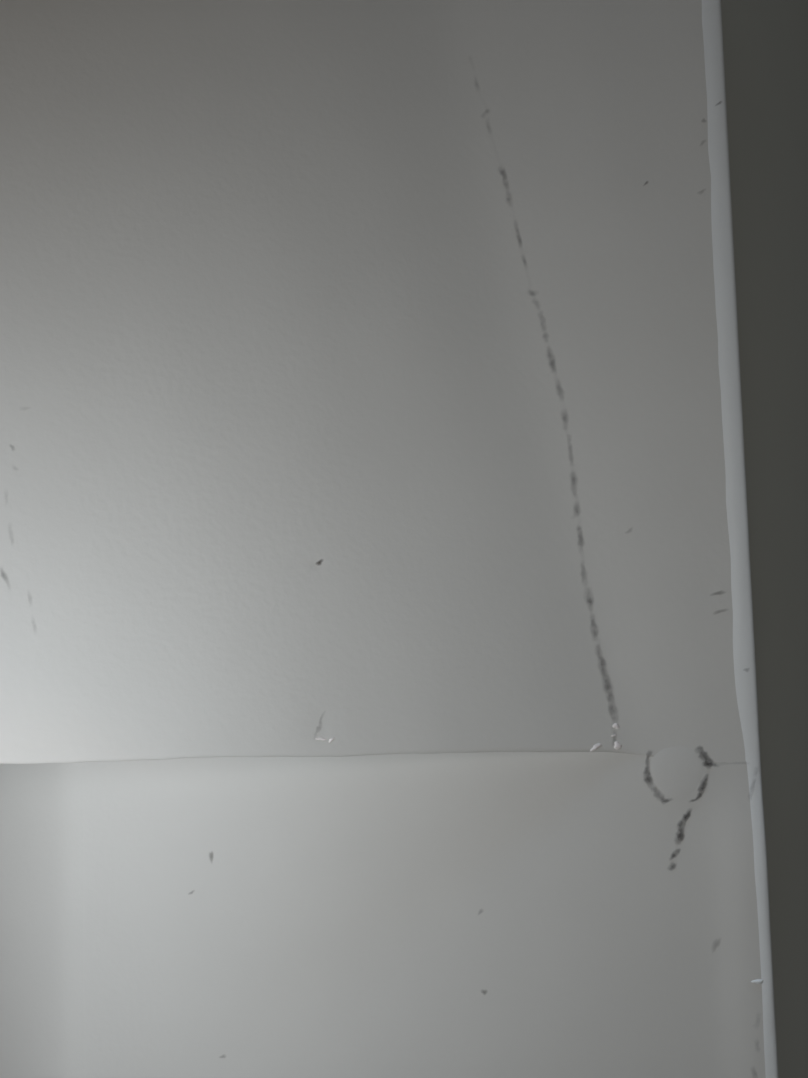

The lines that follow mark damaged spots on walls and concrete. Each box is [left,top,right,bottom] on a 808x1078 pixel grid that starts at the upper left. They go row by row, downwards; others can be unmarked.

crack [672,752,711,867]